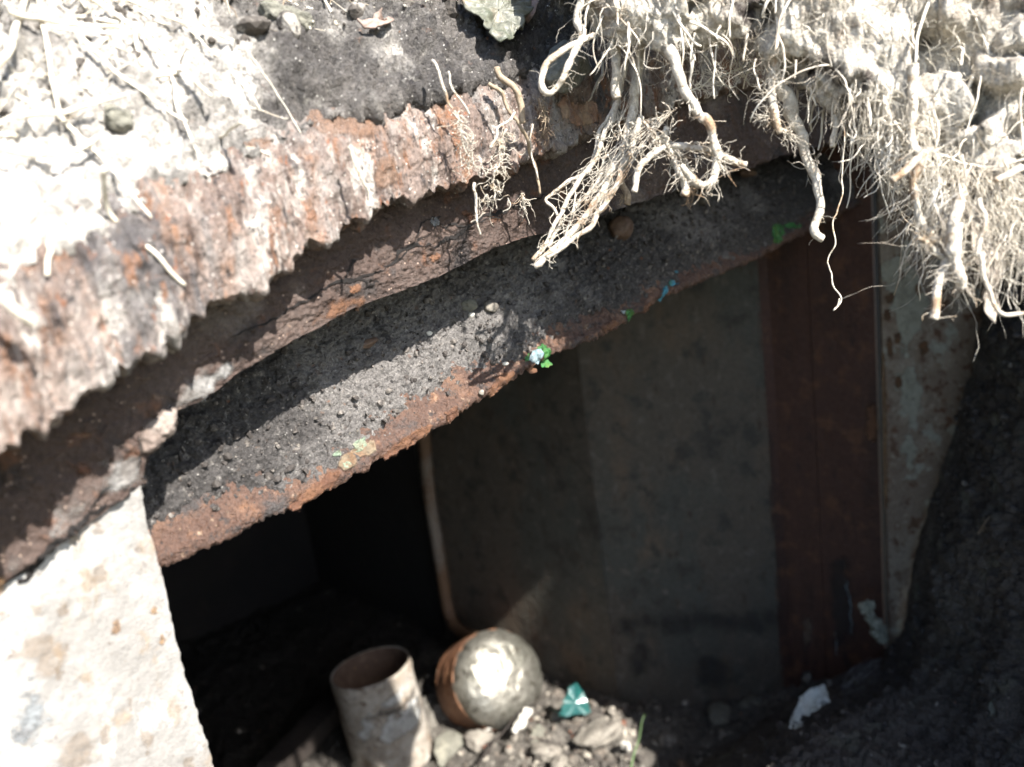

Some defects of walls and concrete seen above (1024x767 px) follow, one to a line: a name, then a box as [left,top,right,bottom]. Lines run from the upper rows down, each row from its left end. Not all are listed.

crack [227,193,545,341]
corrosion [327,284,365,319]
peeling [525,344,552,374]
spalling [180,363,232,402]
corrosion [488,370,516,396]
corrosion [444,406,458,424]
peeling [333,437,376,470]
corrosion [382,424,433,459]
spalling [109,457,138,490]
corrosion [289,470,341,511]